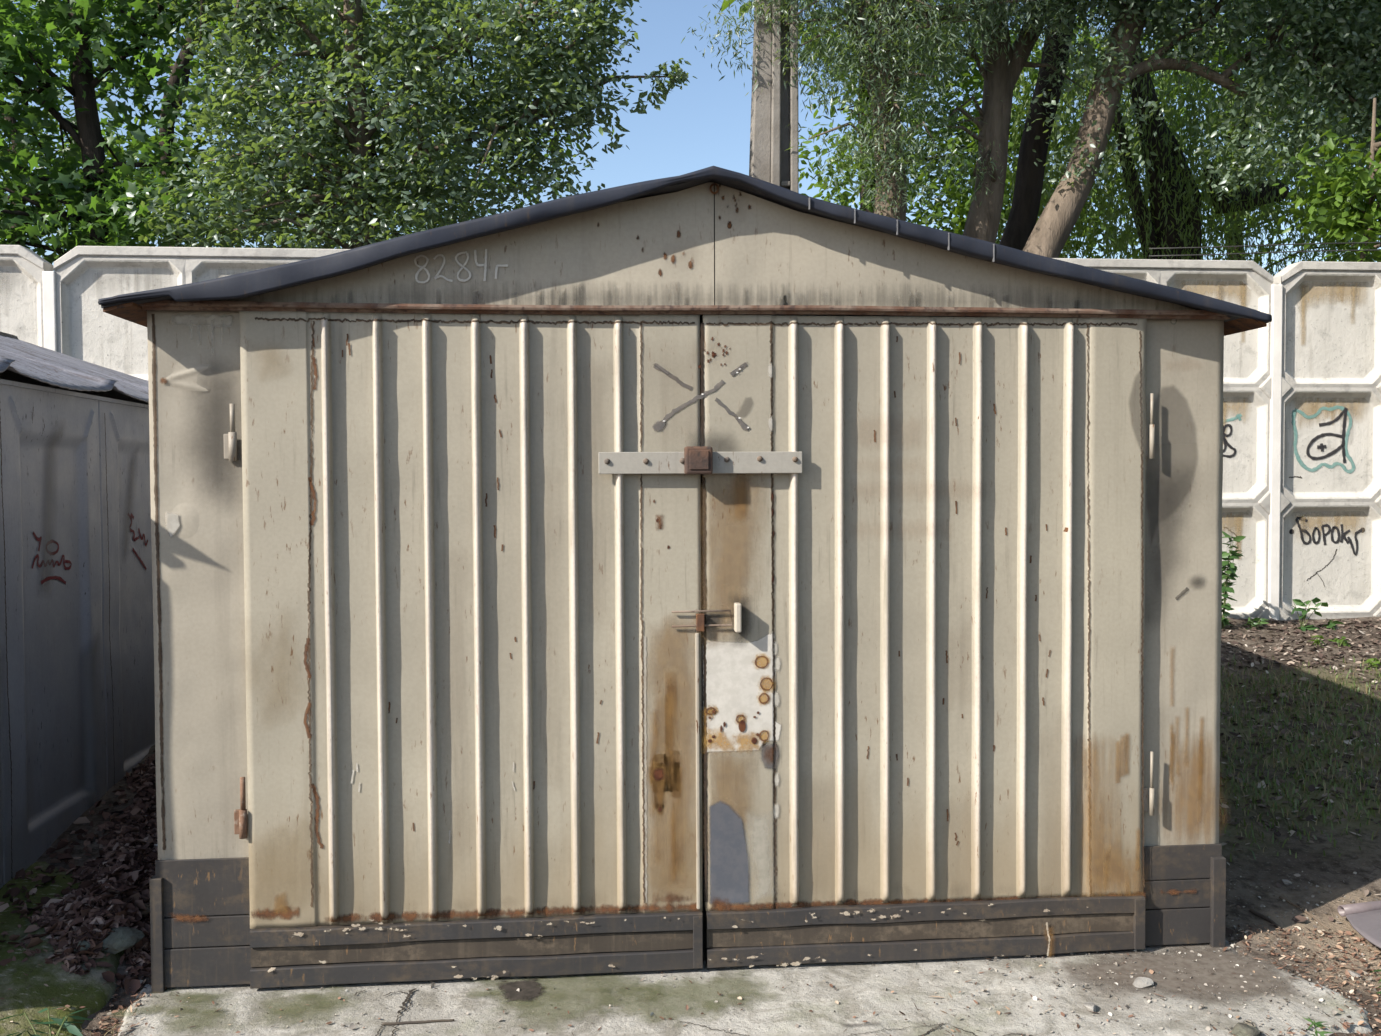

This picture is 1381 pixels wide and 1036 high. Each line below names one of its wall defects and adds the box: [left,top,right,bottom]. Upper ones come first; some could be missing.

rust [698,323,730,446]
peeling [255,317,1137,907]
rust [328,477,1022,923]
rust [252,898,299,919]
crack [849,1023,1033,1036]